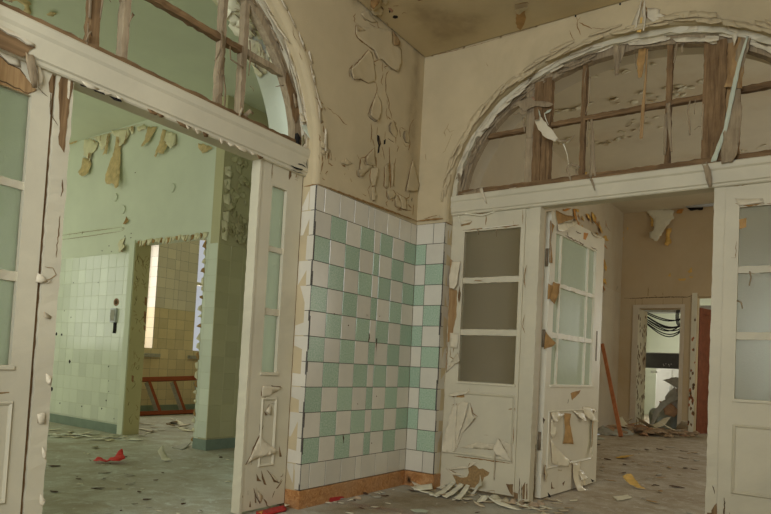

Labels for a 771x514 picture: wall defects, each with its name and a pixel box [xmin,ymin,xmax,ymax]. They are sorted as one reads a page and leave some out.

peeling [0,25,263,248]
peeling [111,232,209,441]
peeling [214,0,420,211]
peeling [544,332,556,349]
peeling [547,282,560,304]
peeling [549,208,609,263]
peeling [441,0,771,237]
peeling [242,470,283,514]